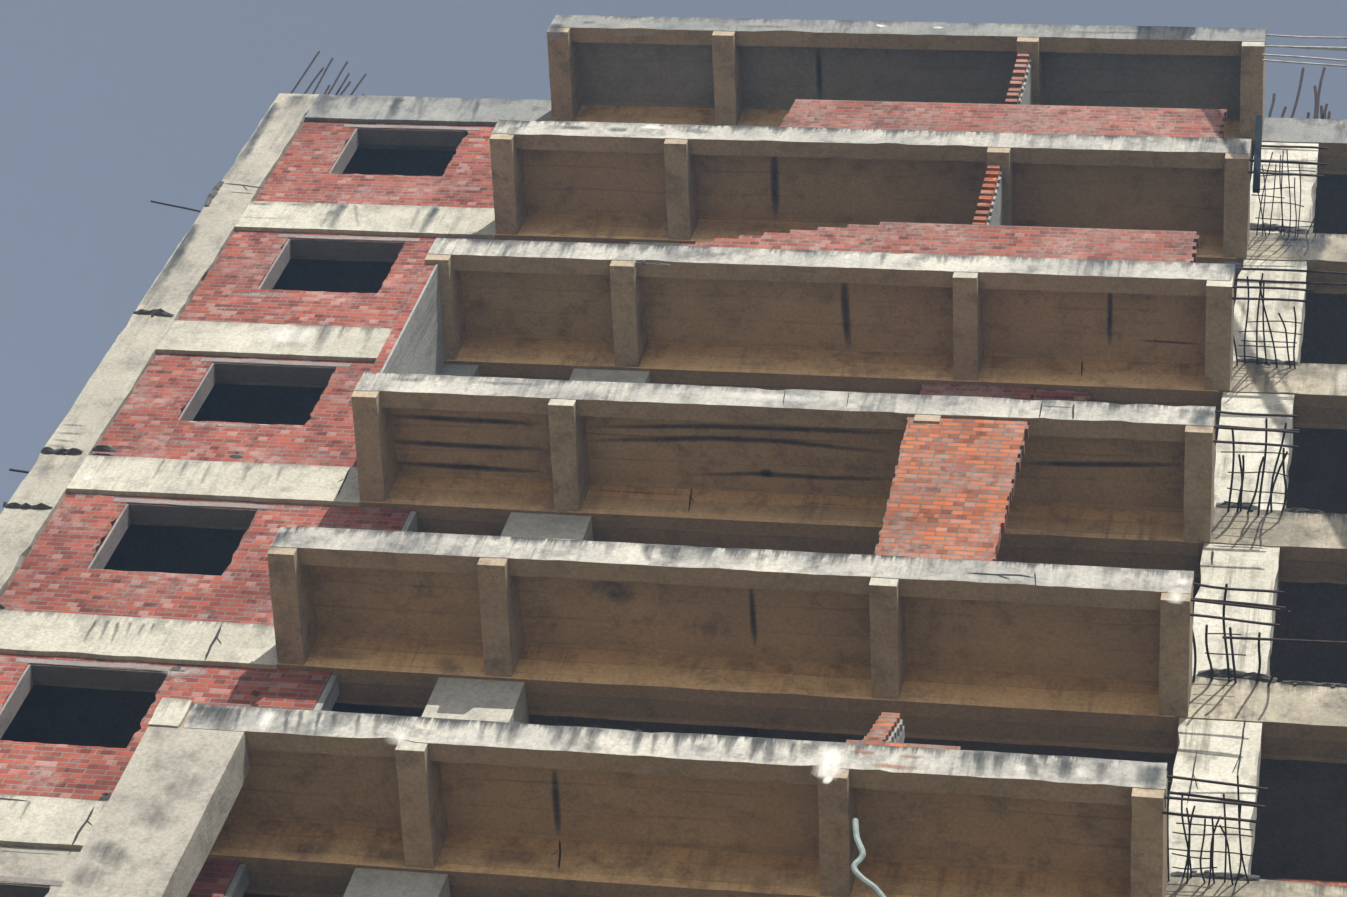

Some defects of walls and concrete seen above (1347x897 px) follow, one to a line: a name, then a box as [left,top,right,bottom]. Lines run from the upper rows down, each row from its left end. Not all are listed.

crack [205,624,222,660]
damp [260,711,336,725]
damp [821,749,841,782]
crack [1,806,95,847]
crack [551,840,561,868]